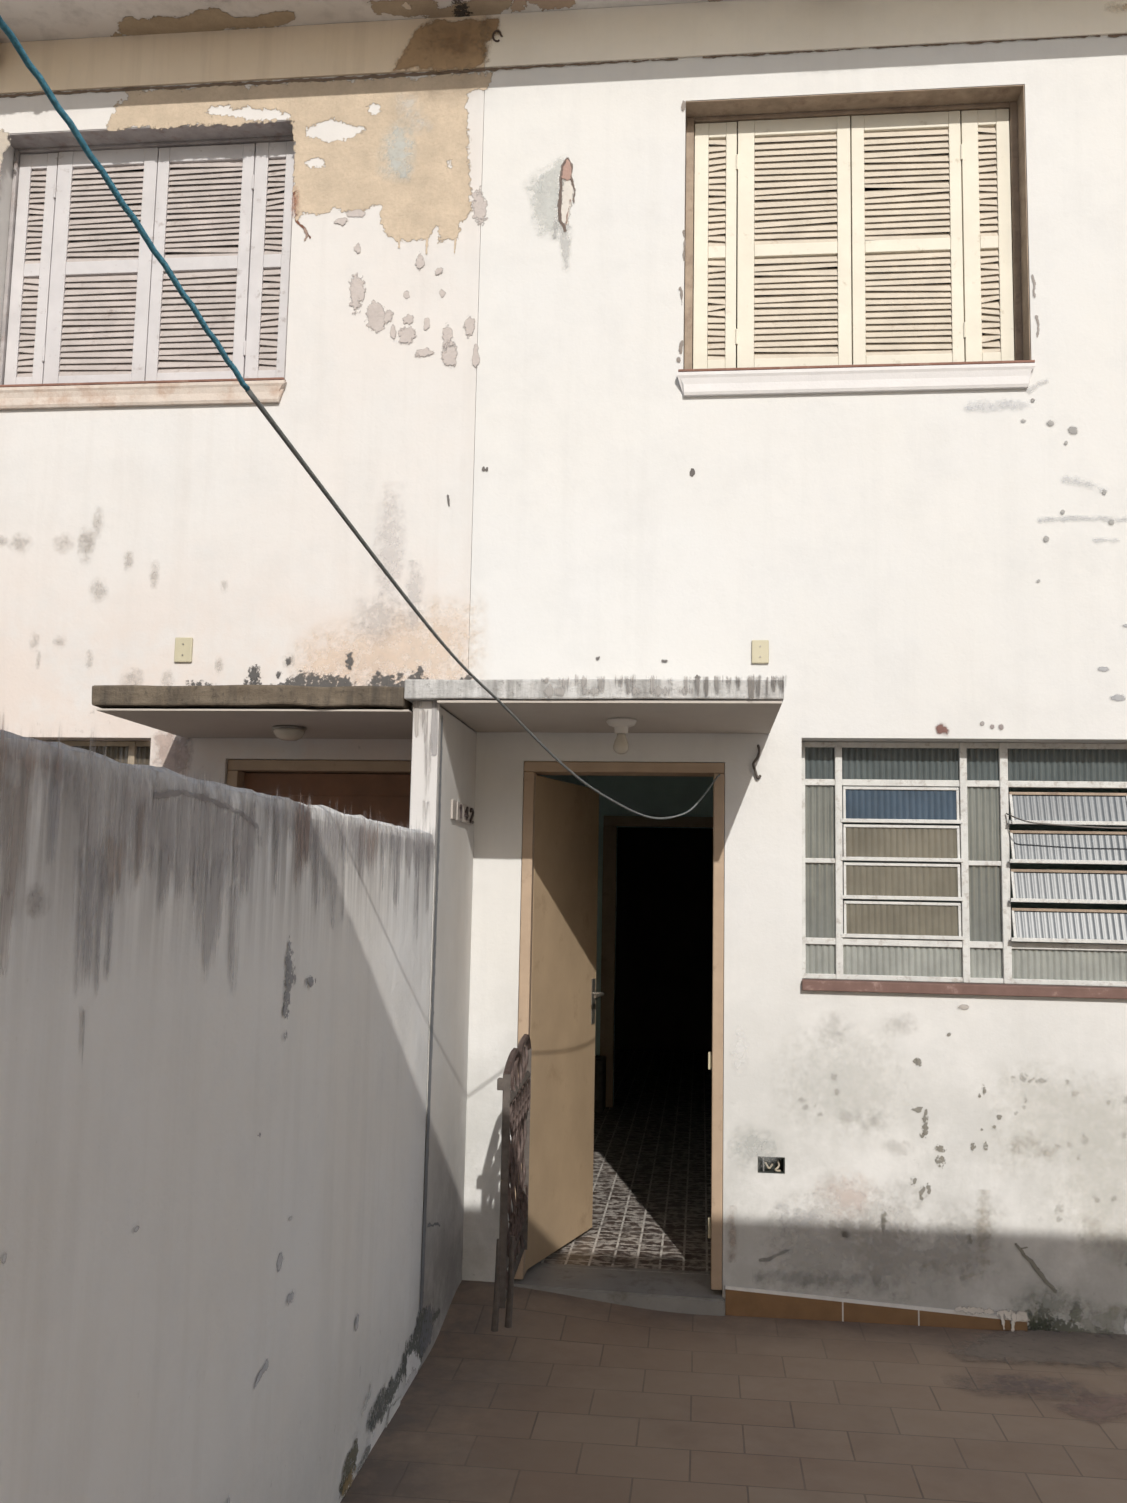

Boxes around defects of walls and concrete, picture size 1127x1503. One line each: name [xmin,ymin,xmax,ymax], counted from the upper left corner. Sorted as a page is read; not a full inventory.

peeling [111,7,296,37]
leakage [393,0,500,72]
peeling [367,0,575,19]
peeling [0,129,11,176]
peeling [106,71,492,297]
peeling [348,273,480,368]
leakage [0,725,436,986]
leakage [283,936,316,1039]
leakage [913,1107,946,1169]
leakage [1025,1291,1116,1335]
flaking render [339,1308,440,1498]